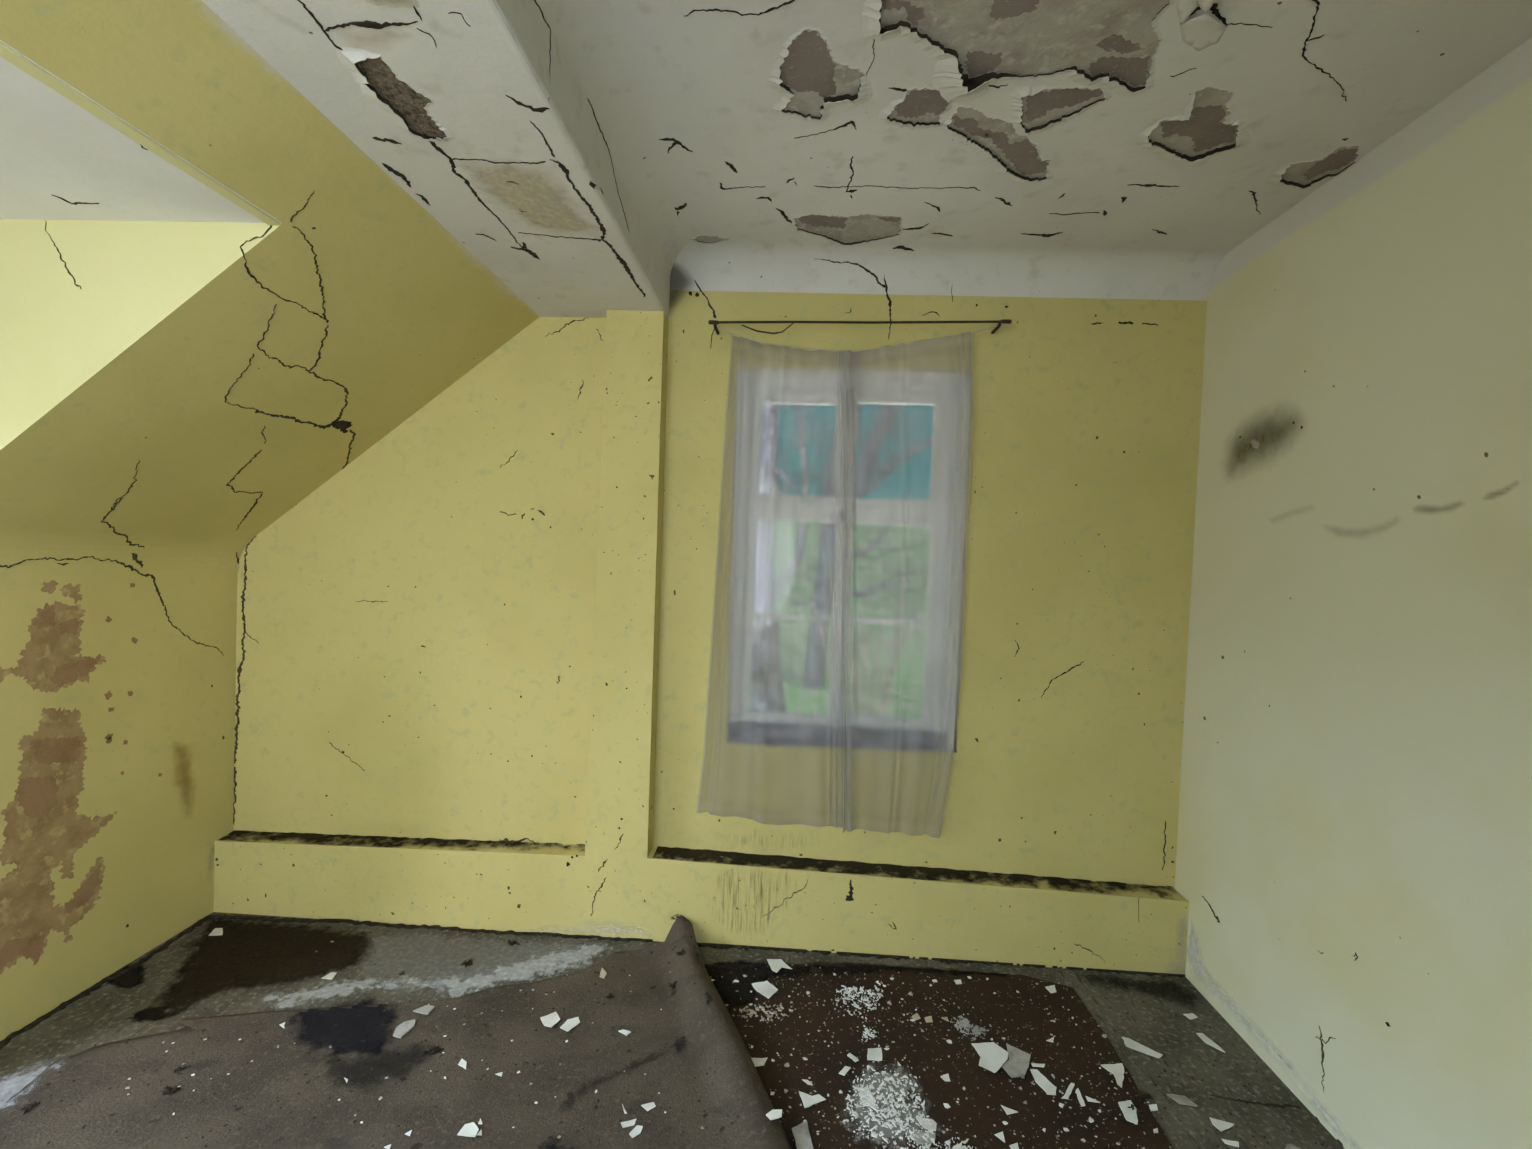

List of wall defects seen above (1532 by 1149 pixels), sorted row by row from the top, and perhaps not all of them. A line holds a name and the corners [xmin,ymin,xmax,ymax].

crack [297,0,470,50]
peeling [336,47,455,142]
crack [372,0,646,297]
leakage [487,173,579,228]
peeling [790,213,904,246]
crack [659,121,1179,339]
peeling [767,0,1227,184]
peeling [1136,85,1250,165]
crack [1180,0,1347,101]
peeling [1265,144,1364,191]
crack [0,192,356,825]
peeling [0,580,117,974]